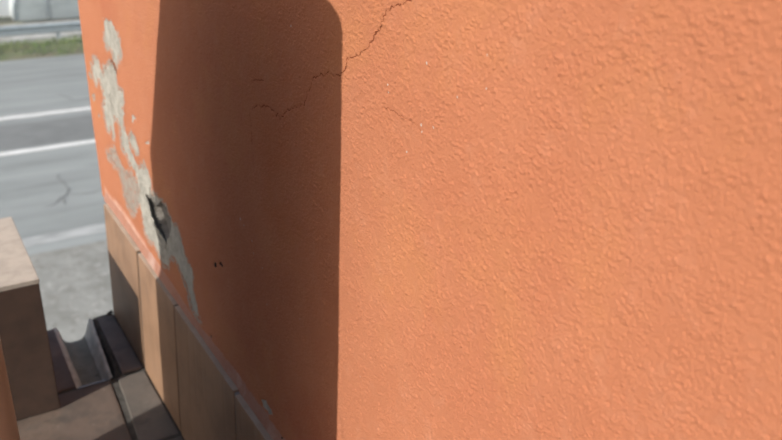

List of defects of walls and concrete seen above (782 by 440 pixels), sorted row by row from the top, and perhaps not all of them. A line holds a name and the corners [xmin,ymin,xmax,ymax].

flaking render [89,18,204,330]
crack [249,0,411,134]